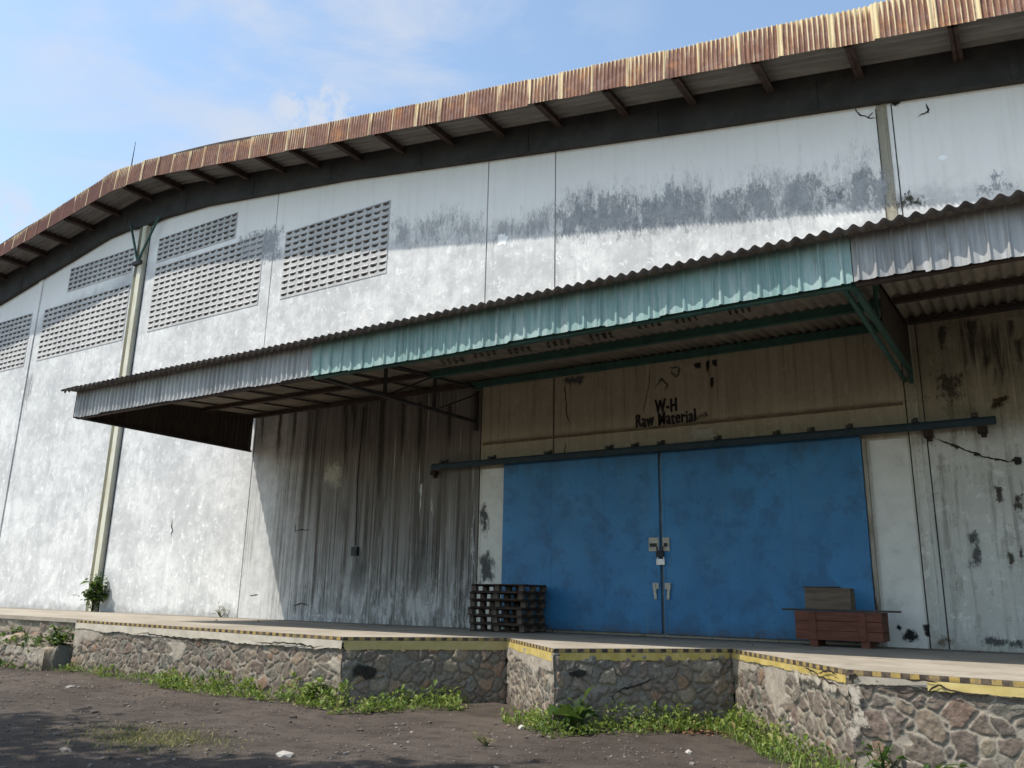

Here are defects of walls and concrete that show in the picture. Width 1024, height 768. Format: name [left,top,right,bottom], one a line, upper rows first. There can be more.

damp [472,505,489,537]
damp [994,486,1024,522]
damp [471,546,493,584]
damp [968,530,982,566]
damp [897,624,951,645]
damp [985,637,1024,648]